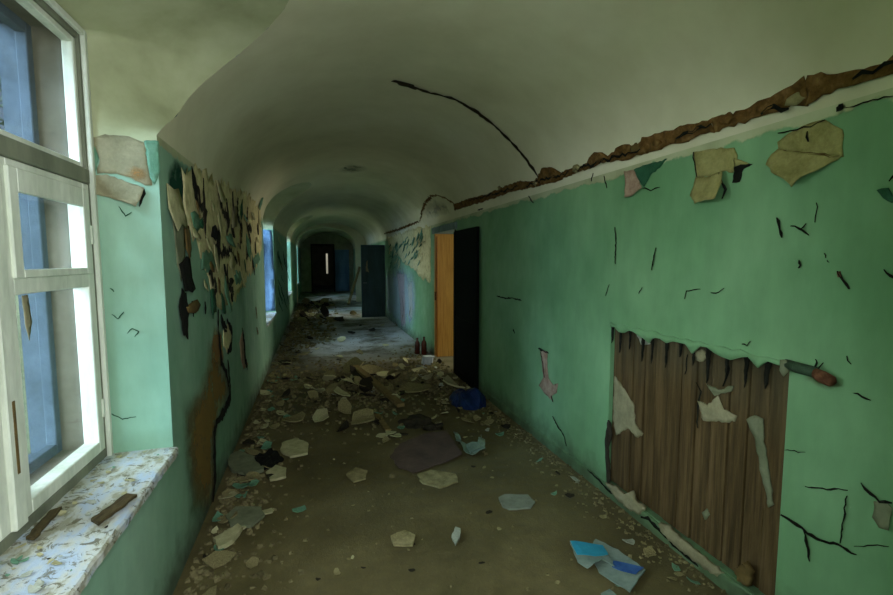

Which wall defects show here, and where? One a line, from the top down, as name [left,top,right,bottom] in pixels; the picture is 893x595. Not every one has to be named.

crack [391,80,538,203]
flaking render [453,55,893,211]
peeling [93,134,290,370]
flaking render [299,298,356,322]
crack [776,203,818,238]
crack [824,253,850,289]
crack [877,175,893,203]
flaking render [587,469,755,587]
crack [780,483,893,561]